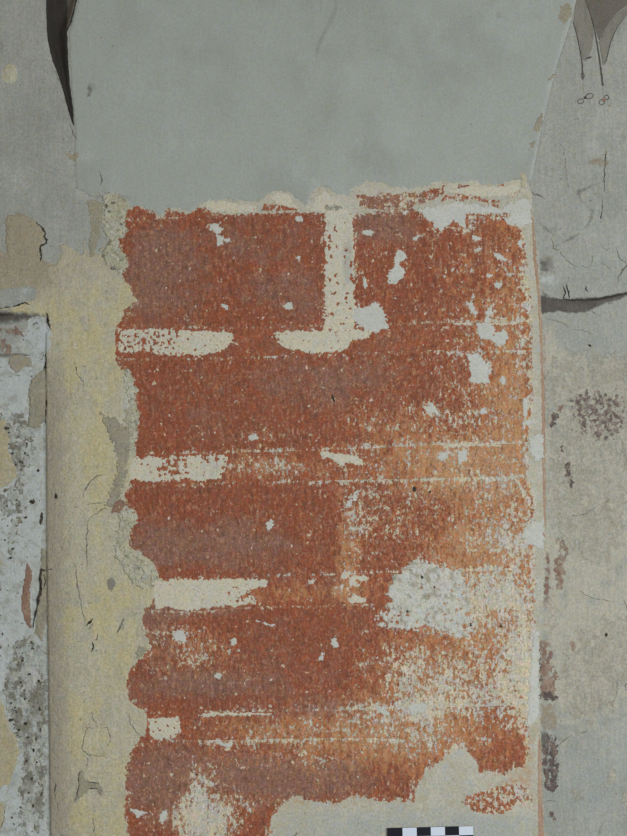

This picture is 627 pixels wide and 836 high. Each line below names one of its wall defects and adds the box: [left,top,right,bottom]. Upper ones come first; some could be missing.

spalling [86,192,129,276]
crack [1,302,50,328]
peeling [22,315,52,355]
crack [540,223,627,334]
spalling [100,368,159,591]
spalling [0,362,50,836]
peeling [73,770,103,803]